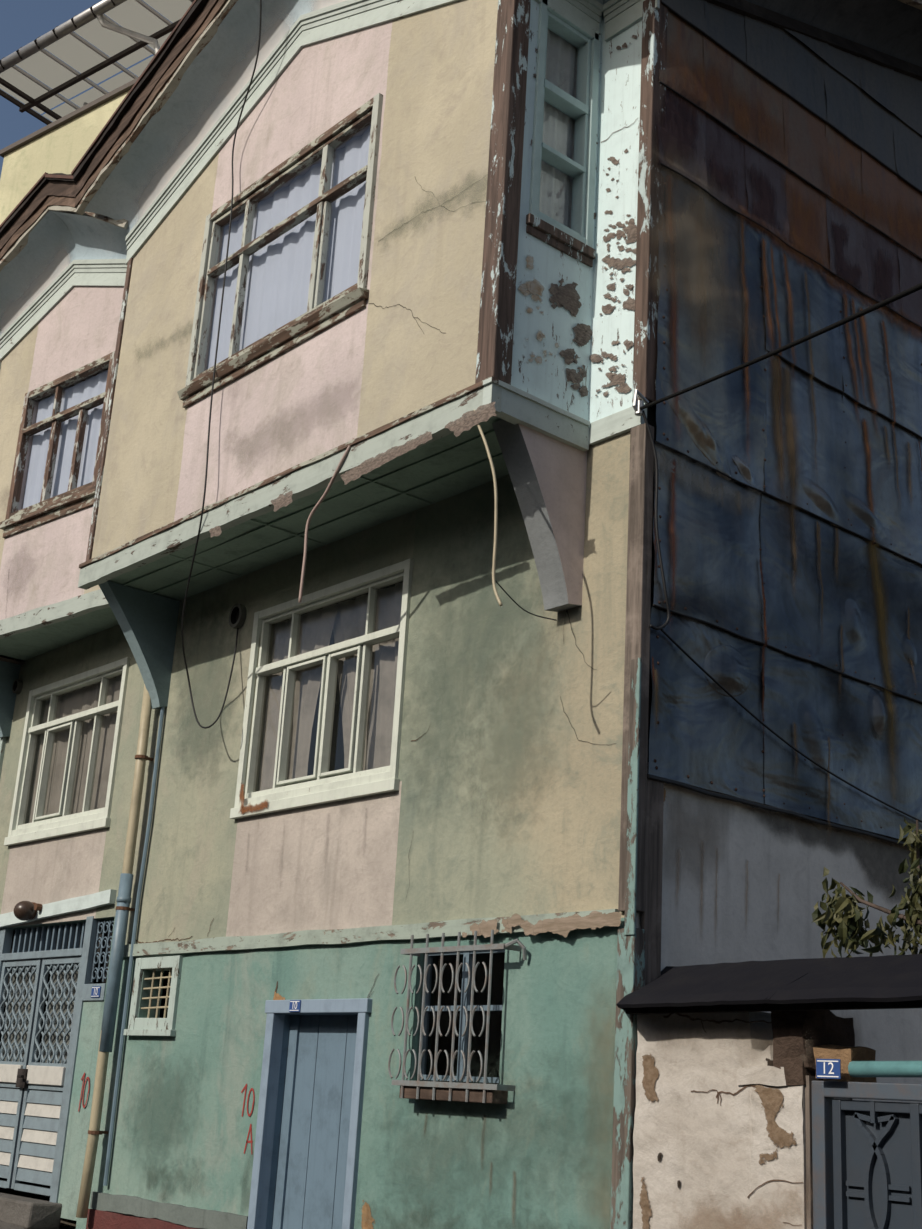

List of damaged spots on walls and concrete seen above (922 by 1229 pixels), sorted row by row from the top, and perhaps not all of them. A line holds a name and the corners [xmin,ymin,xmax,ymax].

peeling [594,149,637,317]
crack [369,303,442,333]
peeling [518,256,633,397]
peeling [445,402,497,437]
rust [762,239,798,578]
peeling [340,431,433,485]
rust [832,221,922,763]
peeling [462,911,622,938]
spalling [642,1053,659,1102]
crack [691,1084,760,1106]
spalling [754,1085,797,1164]
spalling [639,1177,652,1229]